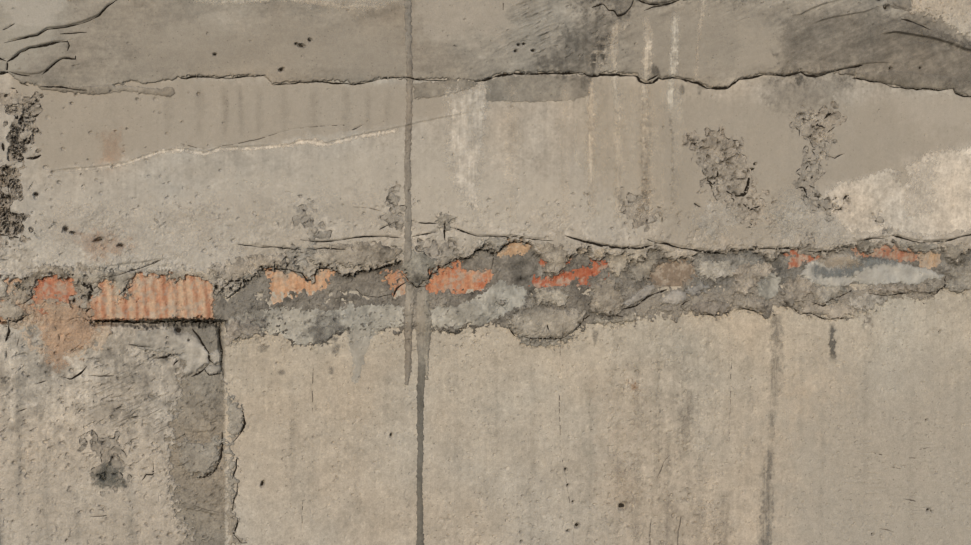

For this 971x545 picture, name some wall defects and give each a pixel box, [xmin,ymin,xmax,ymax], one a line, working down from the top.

crack [0,0,129,91]
crack [181,75,445,85]
crack [475,65,971,97]
flaking render [909,0,971,39]
crack [0,114,41,238]
spalling [0,89,48,248]
spalling [682,126,774,228]
spalling [790,101,847,222]
spalling [269,195,331,276]
spalling [416,237,466,266]
spalling [69,274,102,325]